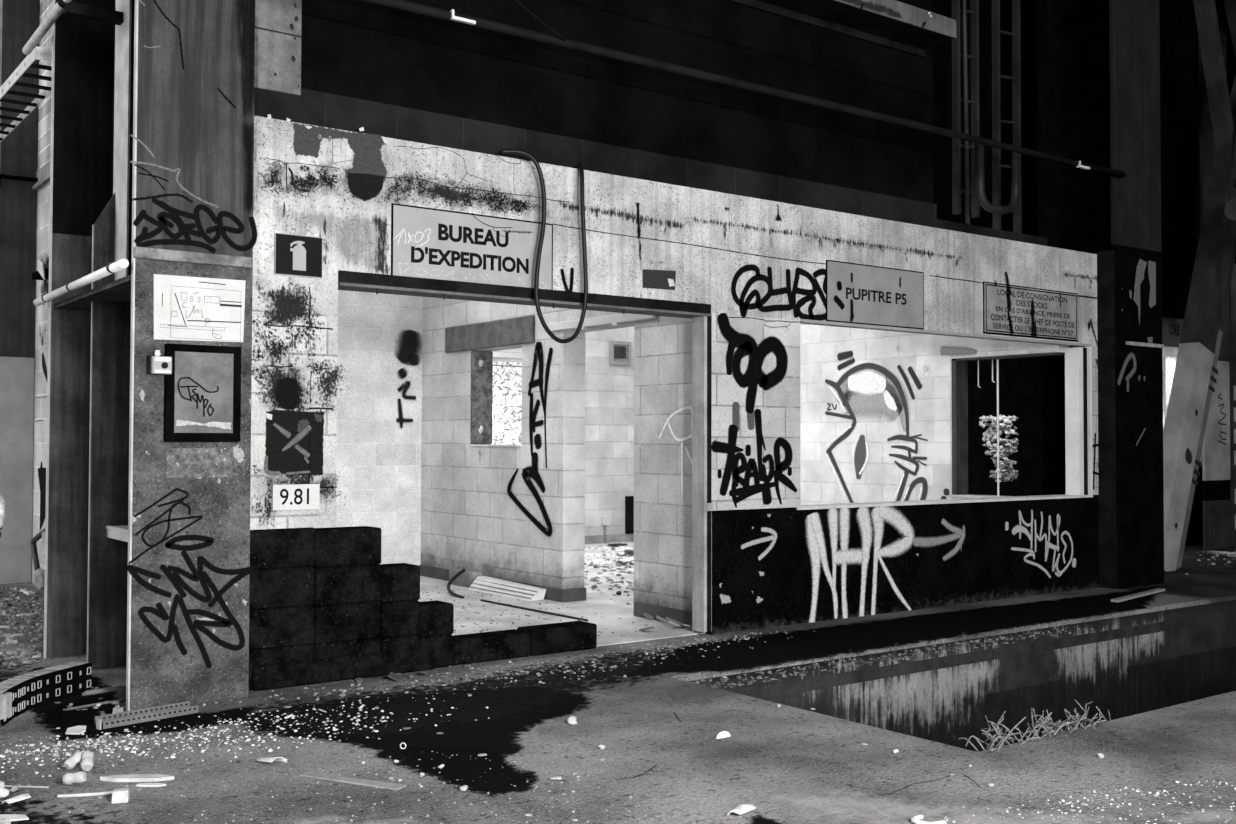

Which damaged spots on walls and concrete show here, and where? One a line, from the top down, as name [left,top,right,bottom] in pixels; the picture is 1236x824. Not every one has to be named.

water stain [374,171,540,274]
water stain [560,199,961,266]
water stain [252,279,349,415]